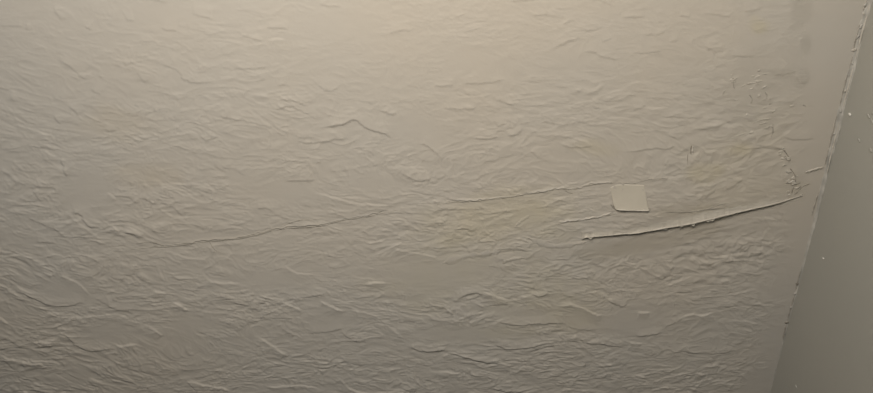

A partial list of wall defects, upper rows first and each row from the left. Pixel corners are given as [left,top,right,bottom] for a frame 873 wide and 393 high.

peeling [610,184,649,212]
crack [136,210,396,253]